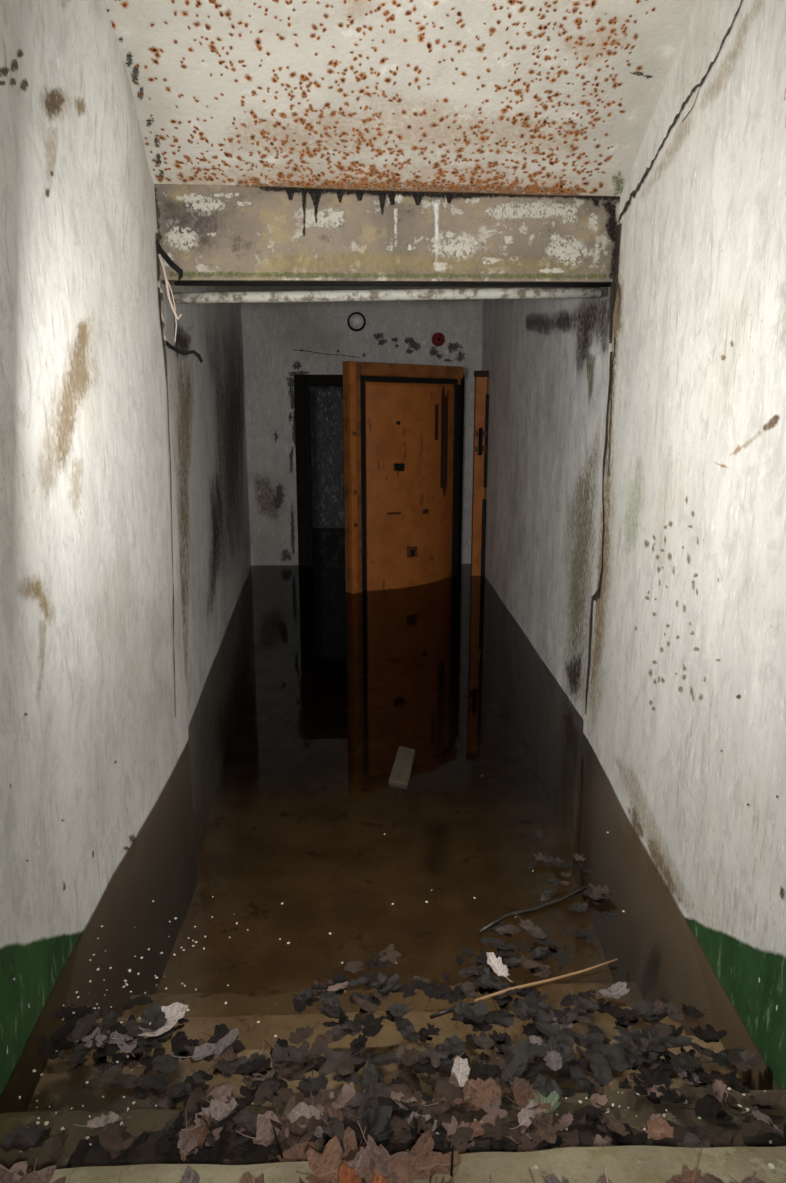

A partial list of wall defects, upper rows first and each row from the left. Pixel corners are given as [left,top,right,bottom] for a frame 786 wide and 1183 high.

leakage [167,202,216,244]
peeling [305,207,346,228]
leakage [260,186,620,256]
peeling [407,197,617,279]
leakage [59,326,89,462]
leakage [169,272,621,396]
leakage [174,323,193,643]
leakage [210,336,244,607]
leakage [566,420,612,694]